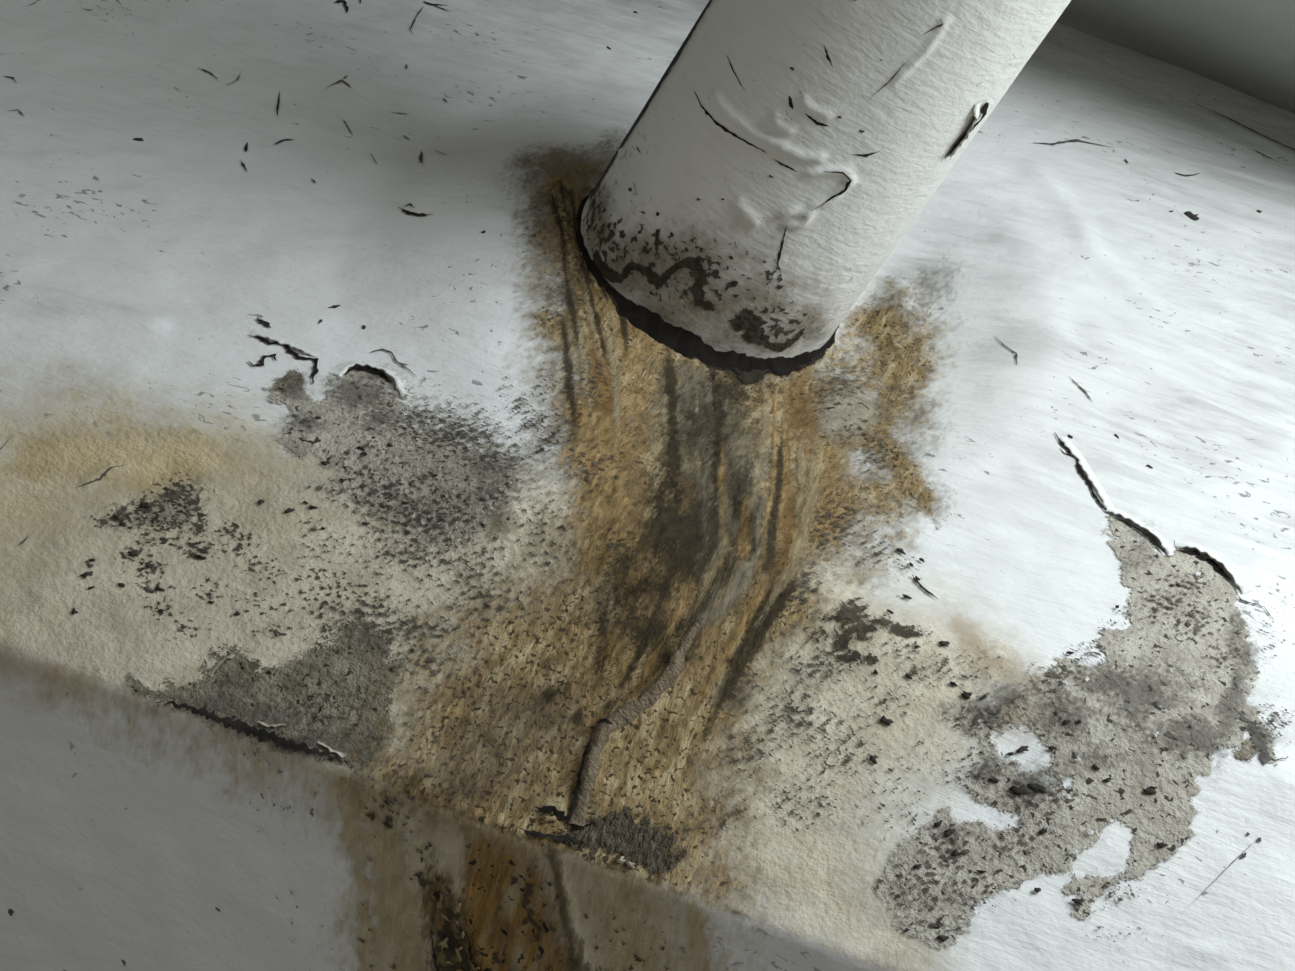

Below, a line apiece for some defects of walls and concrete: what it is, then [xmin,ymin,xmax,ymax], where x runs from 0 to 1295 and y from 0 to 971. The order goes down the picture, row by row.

crack [694,91,879,207]
peeling [593,211,715,311]
crack [247,318,320,394]
crack [372,348,412,373]
crack [1055,433,1115,513]
peeling [80,558,95,590]
damp [0,411,605,790]
peeling [85,264,674,823]
corrosion [210,140,943,971]
peeling [691,344,1295,950]
damp [661,548,1010,971]
peeling [519,802,688,879]